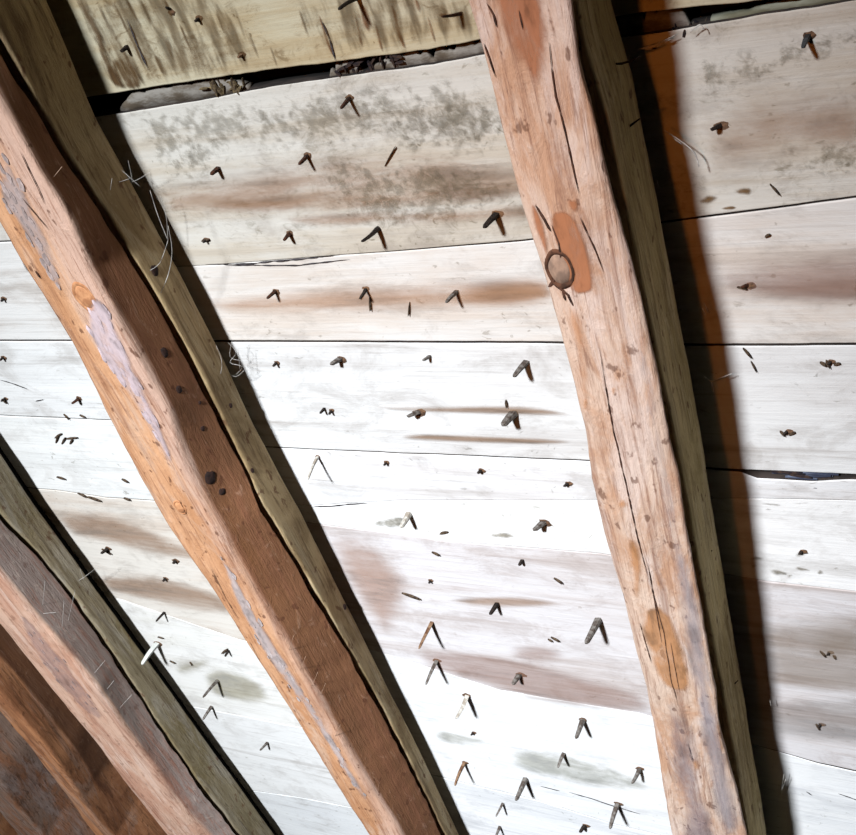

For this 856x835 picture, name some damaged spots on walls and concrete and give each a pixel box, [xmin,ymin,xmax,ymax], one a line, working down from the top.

leakage [80,1,141,89]
crack [549,46,579,193]
crack [535,205,561,258]
crack [580,218,603,270]
crack [548,279,573,306]
crack [599,350,679,705]